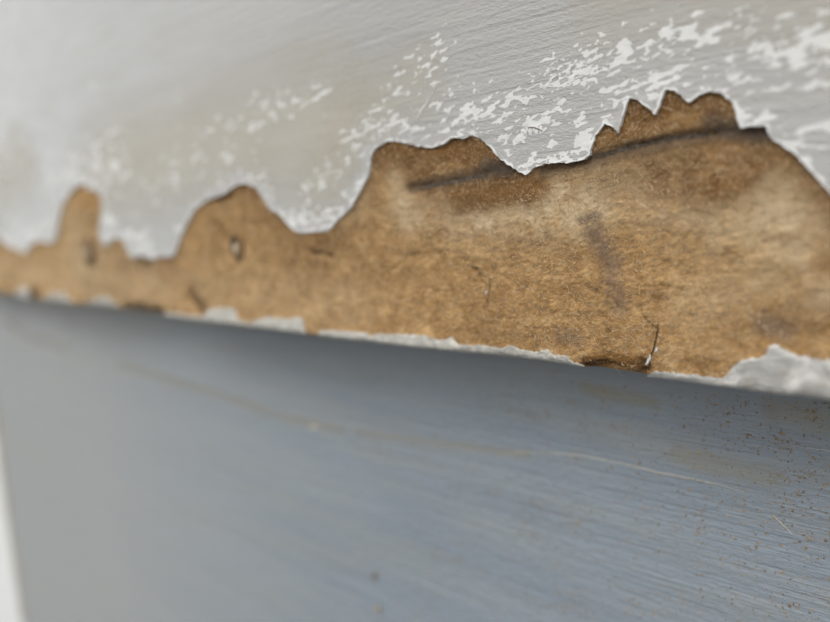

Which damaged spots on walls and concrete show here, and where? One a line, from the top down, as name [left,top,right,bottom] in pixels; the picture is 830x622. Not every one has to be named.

peeling [0,87,830,401]